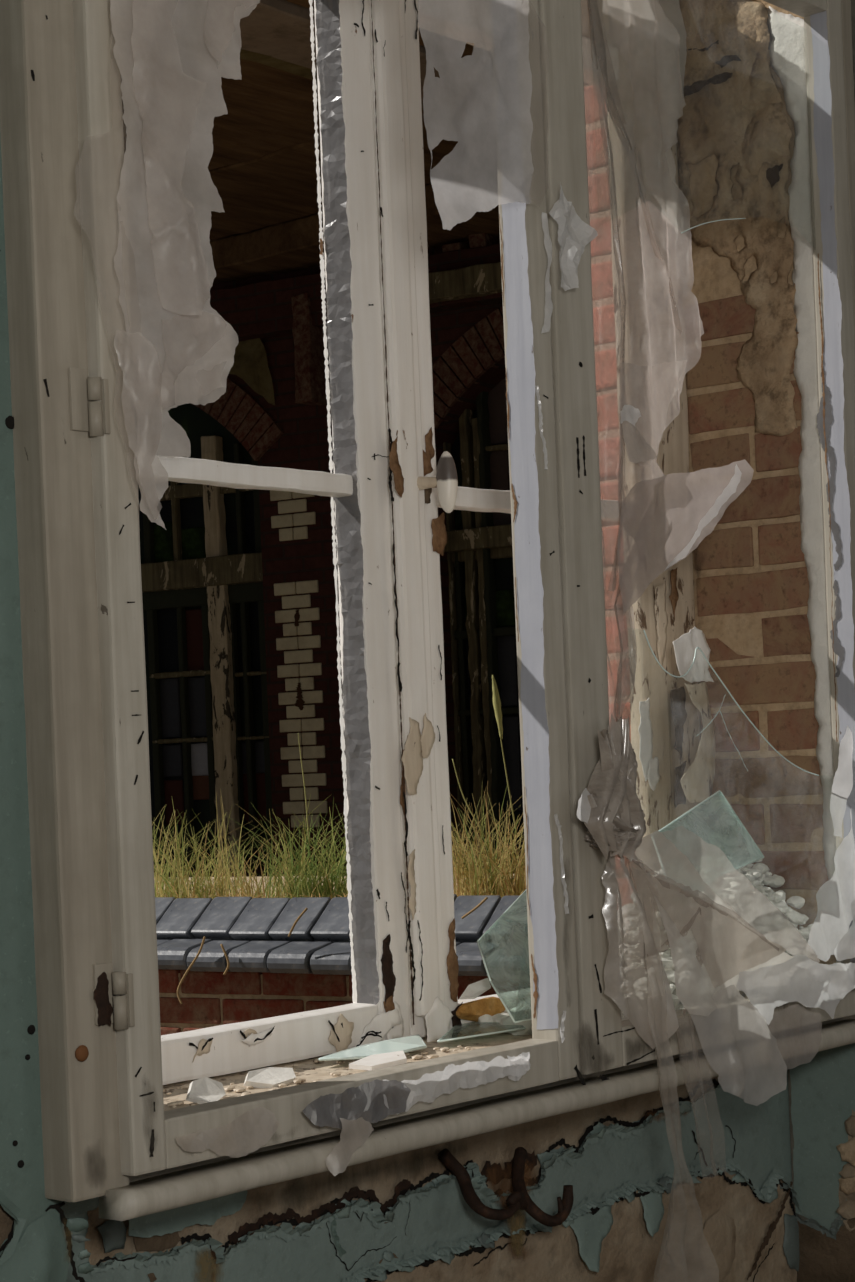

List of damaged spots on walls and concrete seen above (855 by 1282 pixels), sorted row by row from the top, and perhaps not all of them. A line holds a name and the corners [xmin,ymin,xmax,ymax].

peeling [389,430,404,498]
peeling [423,427,435,504]
peeling [431,512,447,556]
peeling [400,713,435,813]
peeling [328,934,407,1071]
flaking render [85,1076,855,1282]
flaking render [0,1189,26,1266]